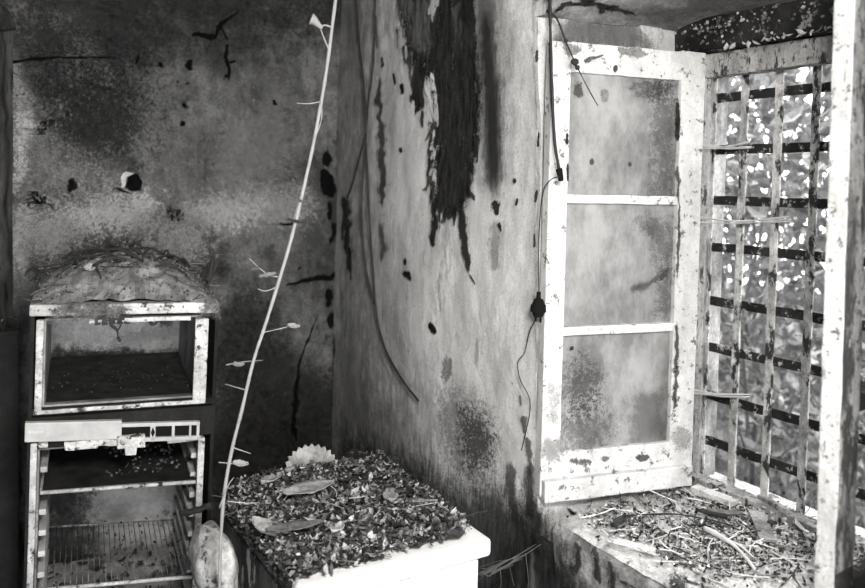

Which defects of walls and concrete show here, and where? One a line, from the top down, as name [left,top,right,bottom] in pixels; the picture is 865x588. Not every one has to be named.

crack [13,55,116,63]
flaking render [116,172,142,194]
water stain [12,45,353,280]
flaking render [532,0,636,300]
water stain [325,289,335,357]
crack [291,318,317,441]
flaking render [519,396,534,477]